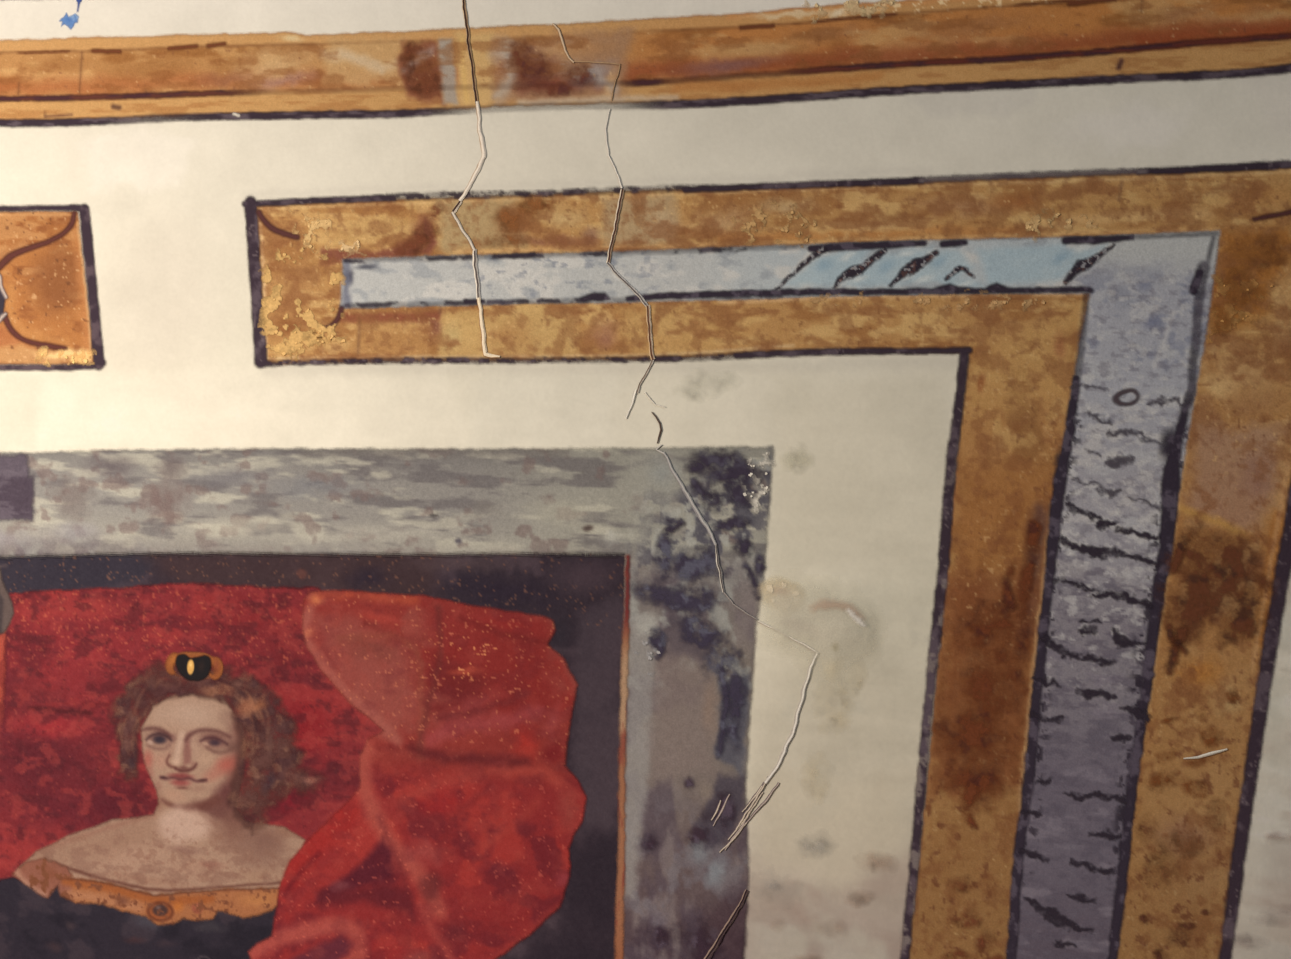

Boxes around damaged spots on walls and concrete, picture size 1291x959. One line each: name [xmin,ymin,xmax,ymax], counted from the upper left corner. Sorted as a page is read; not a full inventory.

peeling [260,216,360,358]
crack [451,0,500,358]
crack [552,23,819,830]
damp [635,519,747,757]
damp [687,451,765,600]
crack [704,890,749,959]